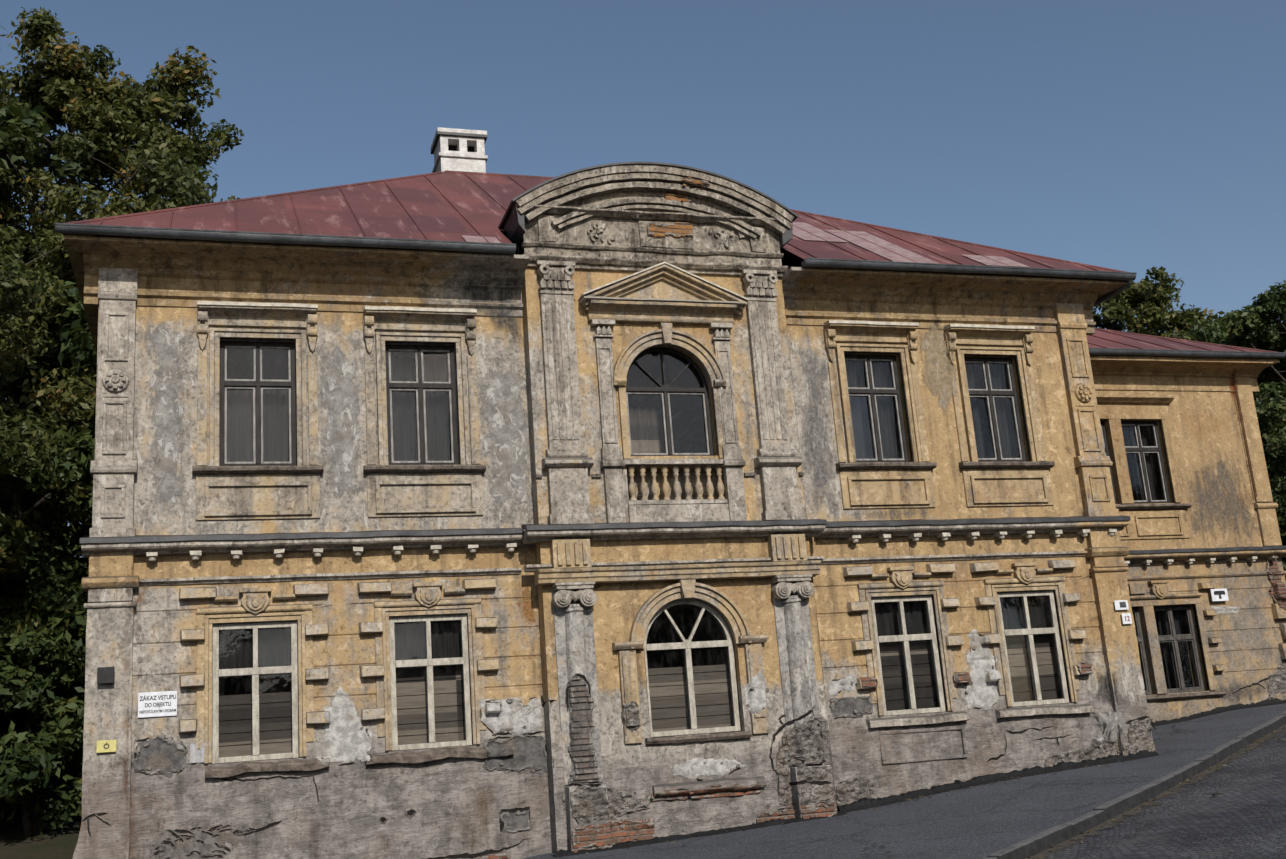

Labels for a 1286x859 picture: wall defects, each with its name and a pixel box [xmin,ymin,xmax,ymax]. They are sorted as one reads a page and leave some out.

damp [1191,462,1253,533]
peeling [953,628,1001,710]
crack [1231,675,1271,693]
peeling [130,733,188,778]
peeling [479,695,555,775]
flaking render [562,667,878,853]
crack [768,705,823,771]
flaking render [1044,715,1156,768]
peeling [148,823,254,859]
crack [235,820,283,836]
crack [419,837,531,859]
flaking render [499,806,531,834]